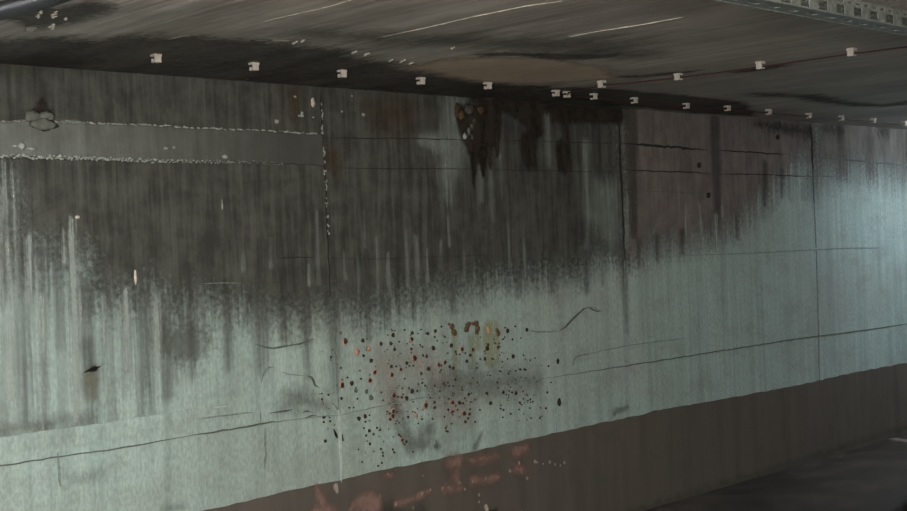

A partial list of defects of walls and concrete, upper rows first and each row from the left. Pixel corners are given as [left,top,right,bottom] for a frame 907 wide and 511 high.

spalling [25,98,59,132]
damp [411,58,619,84]
damp [0,64,907,423]
crack [528,307,602,333]
corrosion [321,321,549,467]
crack [0,324,903,466]